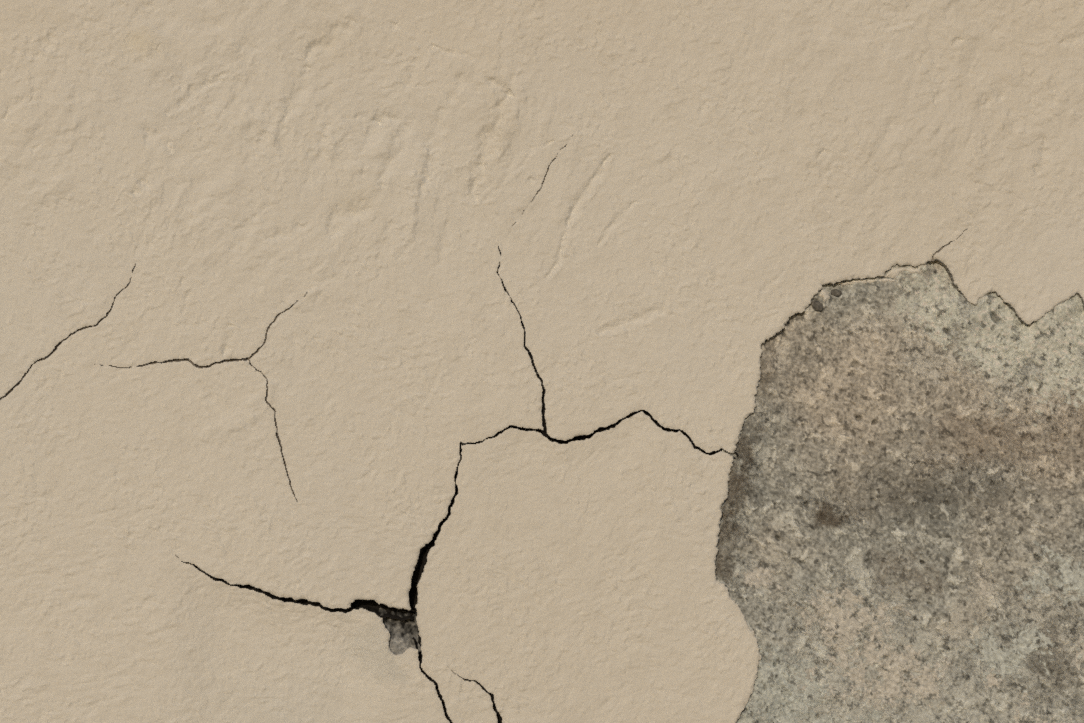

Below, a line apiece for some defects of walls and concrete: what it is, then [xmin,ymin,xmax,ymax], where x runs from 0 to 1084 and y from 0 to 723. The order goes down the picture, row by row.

crack [0,263,136,400]
crack [94,292,307,502]
crack [175,135,739,723]
spalling [715,259,1084,723]